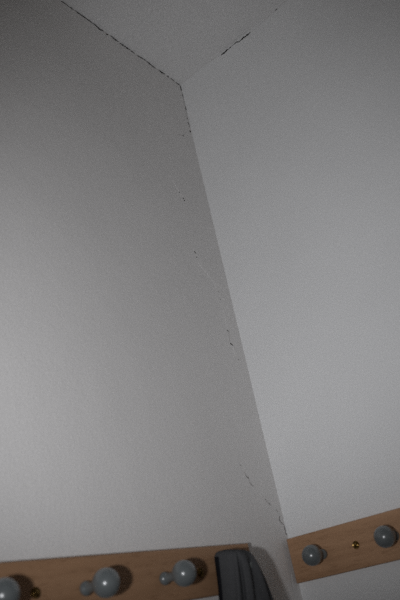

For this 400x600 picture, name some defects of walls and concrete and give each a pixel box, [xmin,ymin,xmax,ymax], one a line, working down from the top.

crack [61,1,285,136]